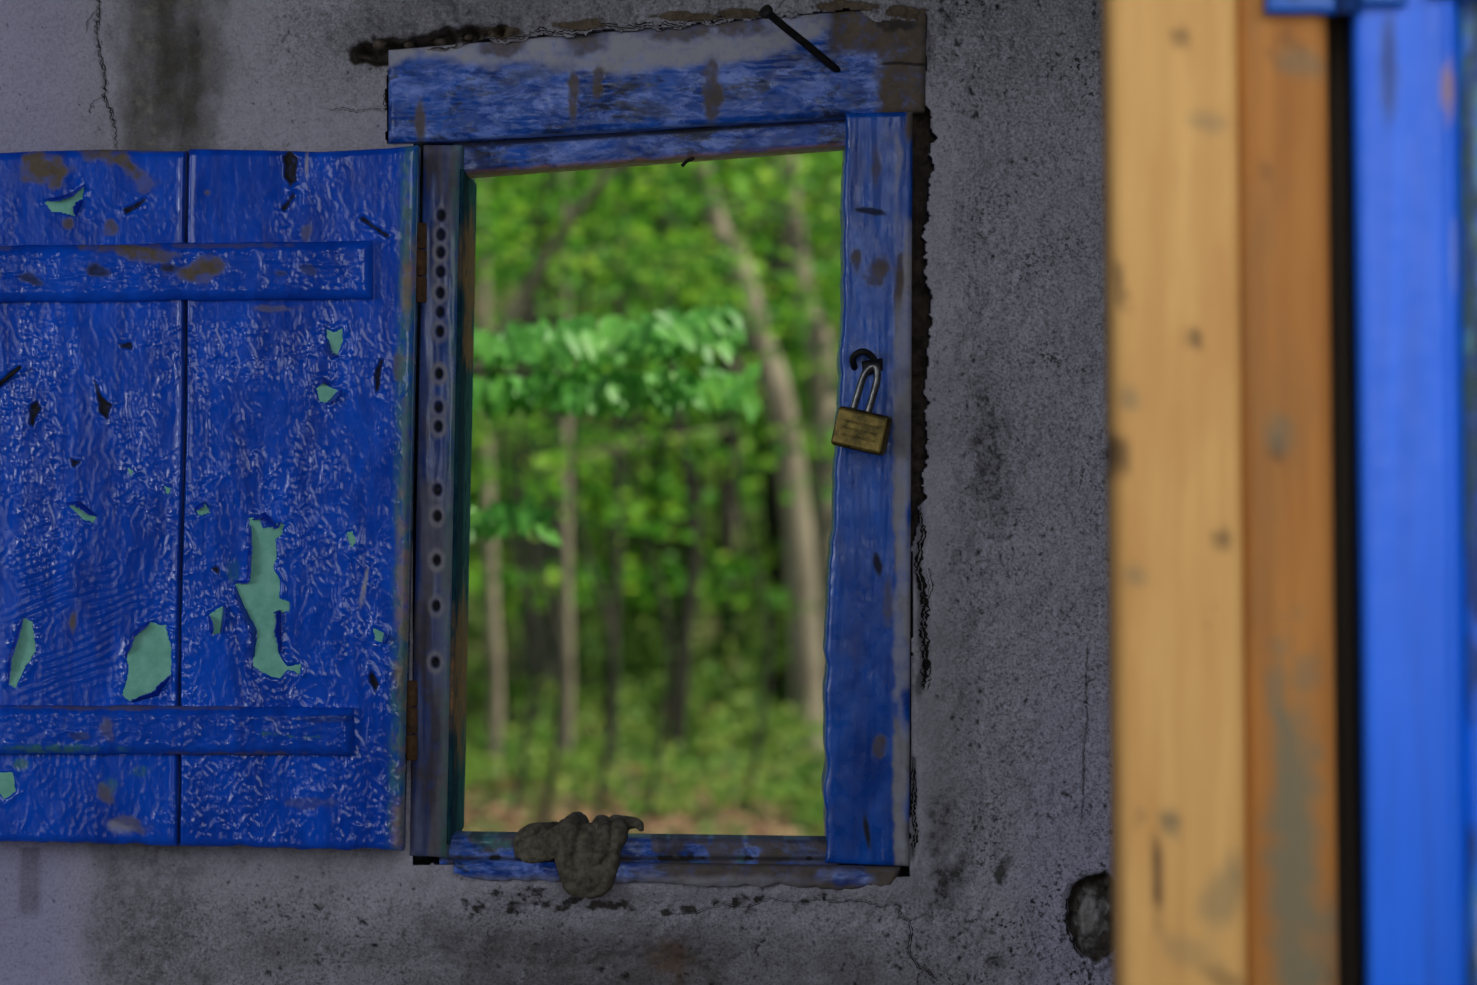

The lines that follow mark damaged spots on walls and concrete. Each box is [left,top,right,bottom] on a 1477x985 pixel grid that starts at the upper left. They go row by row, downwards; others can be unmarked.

spalling [349,8,796,67]
crack [86,0,118,150]
damp [125,0,213,151]
peeling [44,184,85,217]
peeling [324,329,343,358]
peeling [315,377,337,403]
peeling [66,501,97,523]
peeling [208,512,301,678]
peeling [8,617,36,688]
peeling [122,622,172,703]
peeling [0,772,16,799]
spalling [1064,872,1113,962]